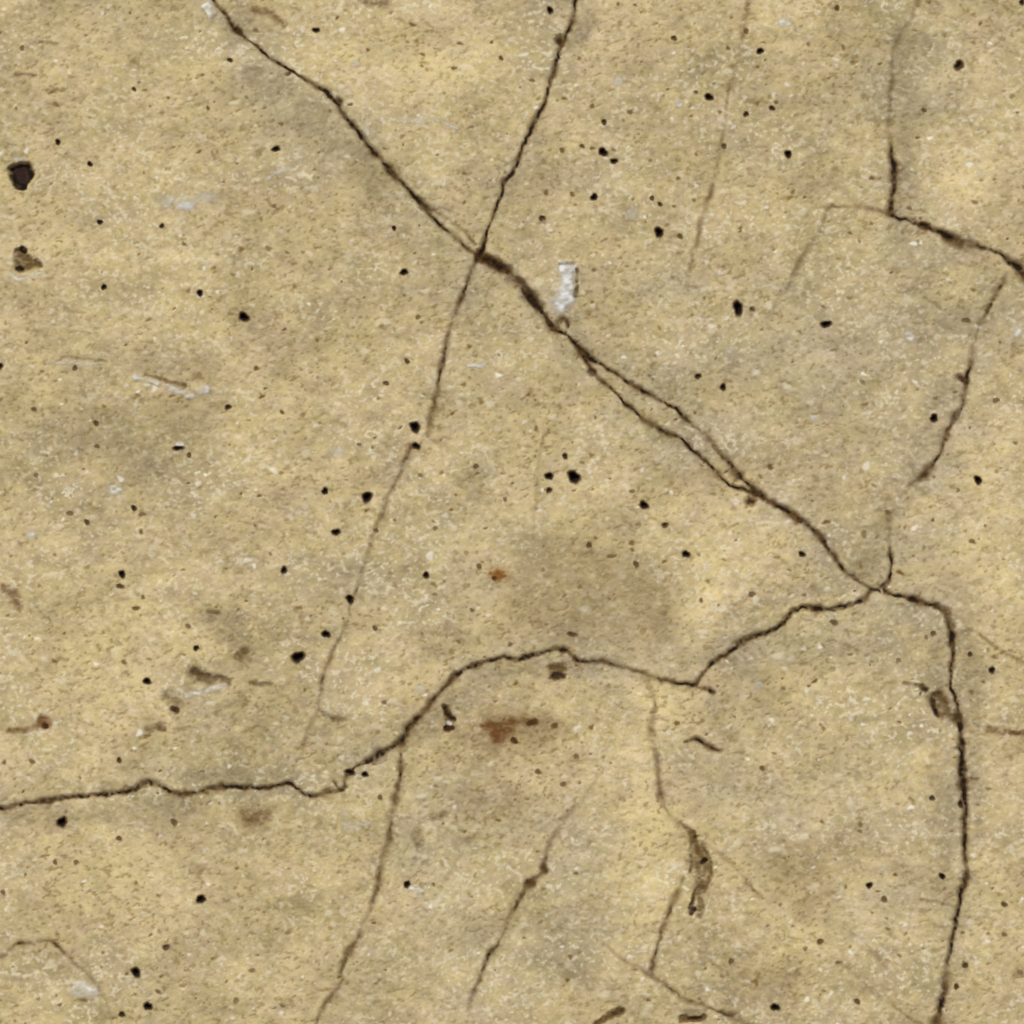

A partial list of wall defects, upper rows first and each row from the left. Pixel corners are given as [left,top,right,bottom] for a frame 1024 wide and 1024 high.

crack [212,0,449,233]
crack [886,144,1024,317]
crack [429,332,450,422]
crack [455,0,973,965]
crack [0,647,646,810]
rust [480,718,538,744]
crack [372,873,381,902]
crack [317,934,360,1021]
crack [473,941,499,992]
crack [649,894,677,992]
crack [712,1008,735,1017]
crack [932,979,949,1024]